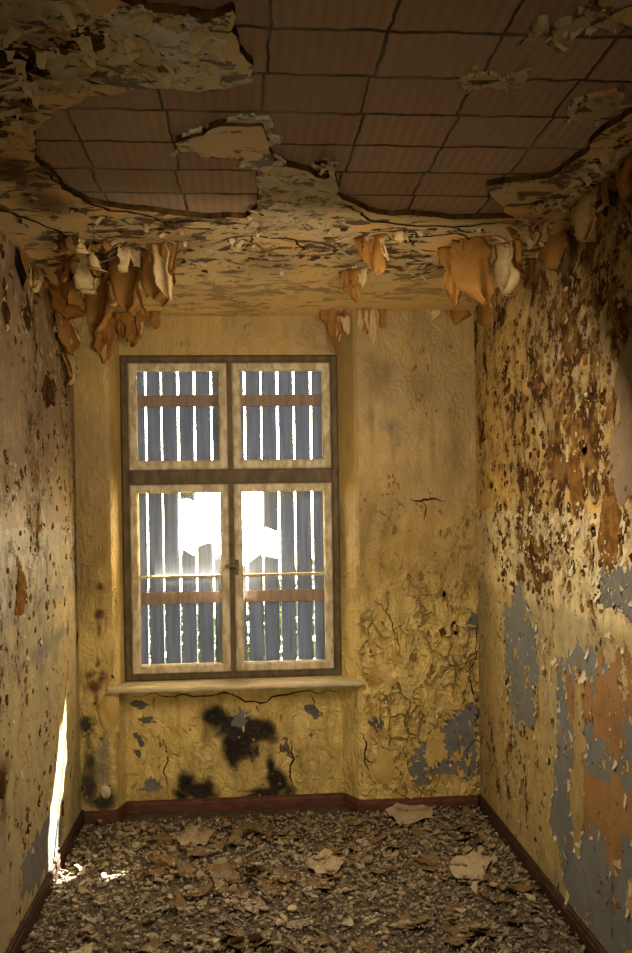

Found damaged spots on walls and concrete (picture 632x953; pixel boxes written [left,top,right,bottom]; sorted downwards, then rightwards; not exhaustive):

peeling [0,207,291,411]
peeling [1,416,67,511]
peeling [0,517,71,735]